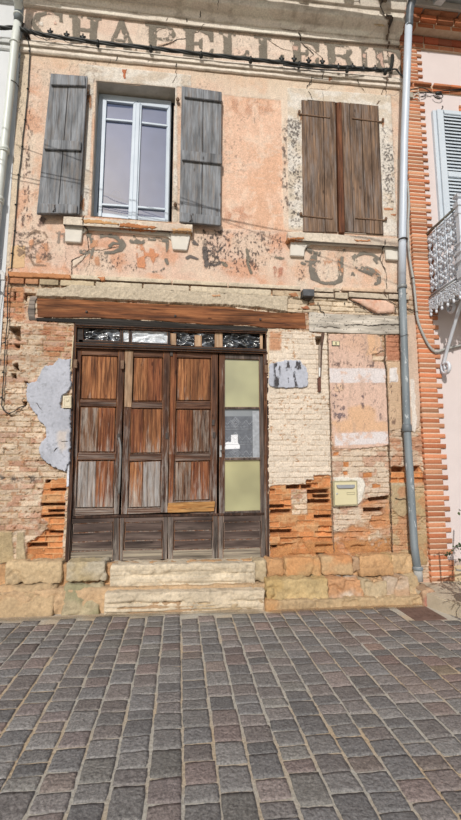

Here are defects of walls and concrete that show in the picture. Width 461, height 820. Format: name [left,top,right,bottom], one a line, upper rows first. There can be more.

crack [269,29,331,98]
crack [357,0,393,104]
peeling [288,119,301,226]
peeling [382,130,396,216]
flaking render [8,240,159,280]
spalling [81,219,158,232]
peeling [171,228,304,275]
spalling [388,466,424,484]
spalling [24,479,68,560]
spalling [269,475,391,557]